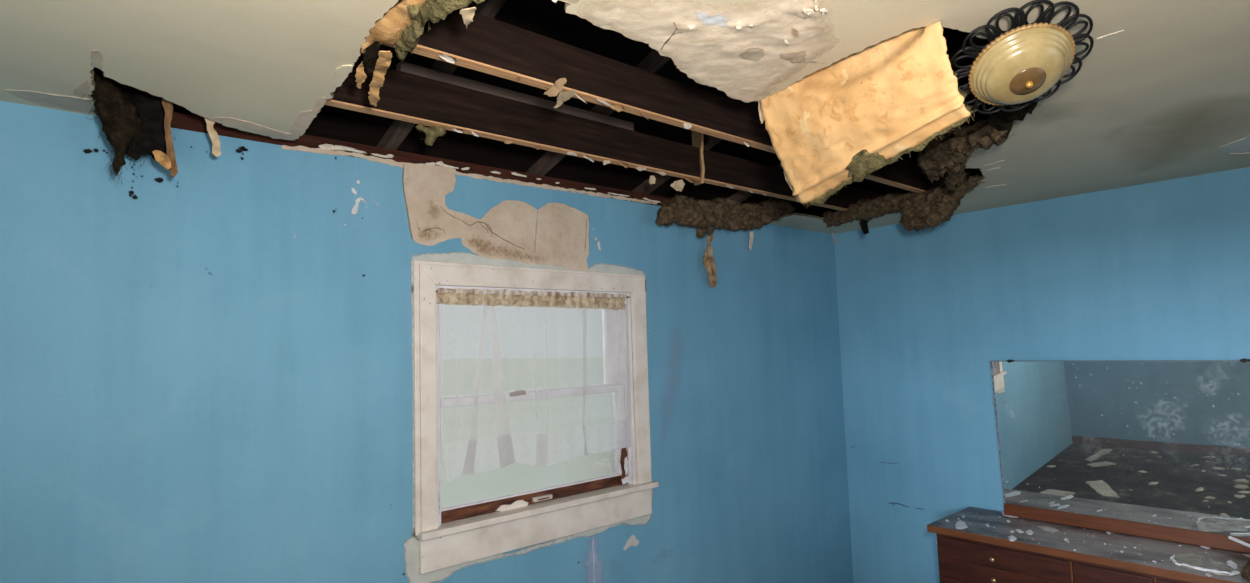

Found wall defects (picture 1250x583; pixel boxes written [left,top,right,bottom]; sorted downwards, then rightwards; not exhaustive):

peeling [740,48,763,61]
peeling [781,51,805,63]
peeling [272,138,661,272]
peeling [623,535,639,550]